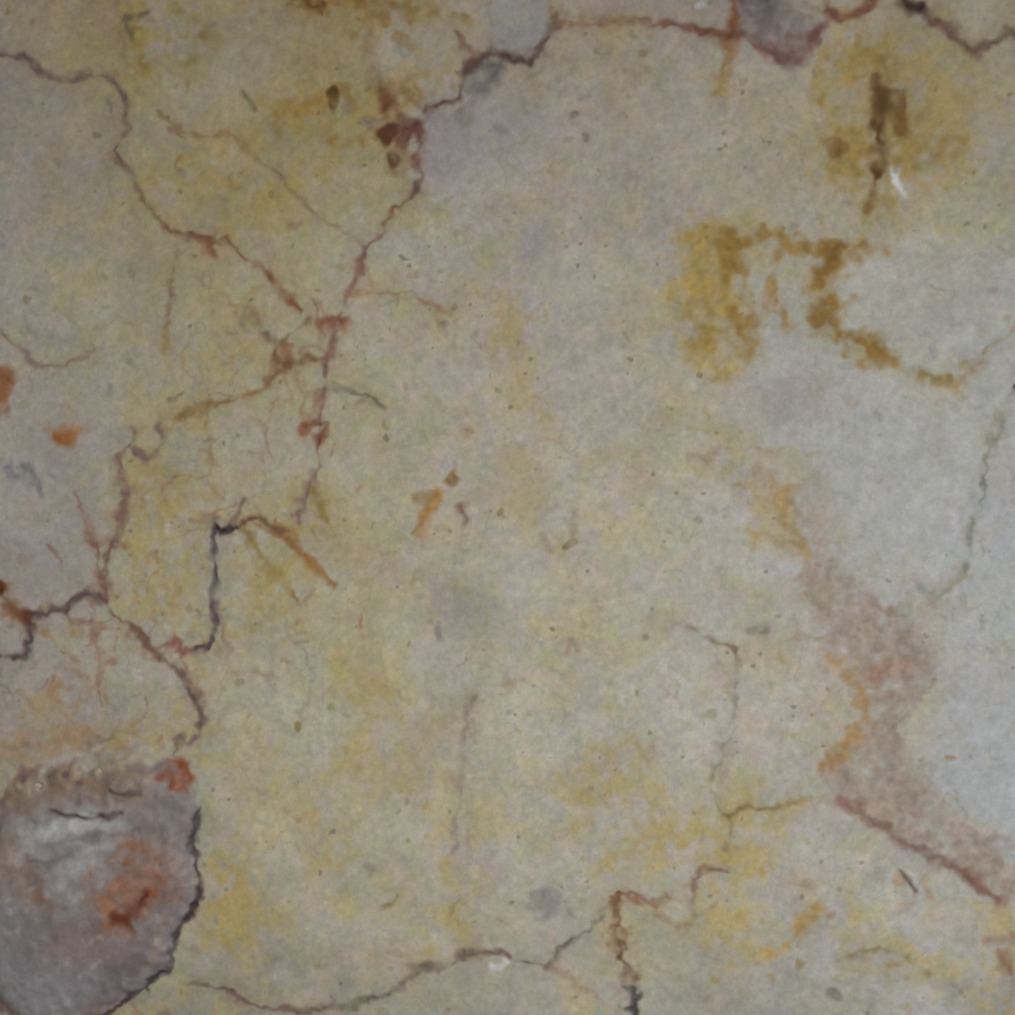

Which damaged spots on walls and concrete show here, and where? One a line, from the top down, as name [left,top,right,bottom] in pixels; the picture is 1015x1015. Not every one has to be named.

damp [716,0,842,76]
crack [820,0,1015,63]
damp [650,201,980,405]
rust [0,354,33,444]
rust [39,397,92,452]
crack [0,0,744,754]
crack [967,319,1015,379]
crack [912,384,1015,610]
crack [126,620,823,1015]
crack [830,943,967,997]